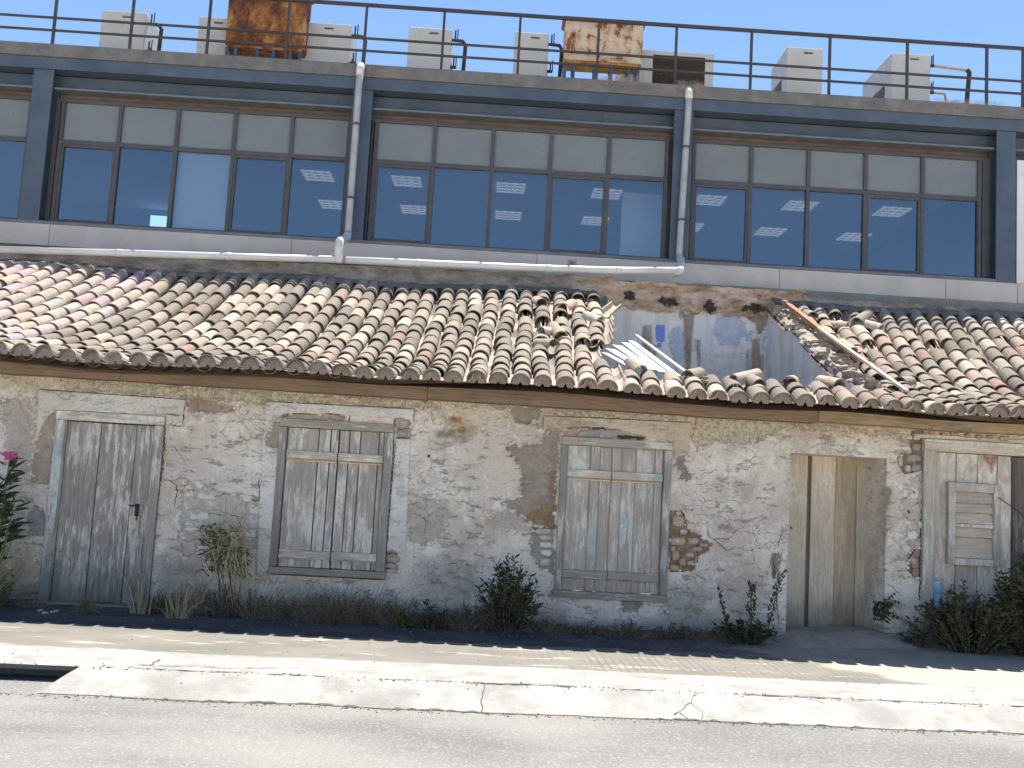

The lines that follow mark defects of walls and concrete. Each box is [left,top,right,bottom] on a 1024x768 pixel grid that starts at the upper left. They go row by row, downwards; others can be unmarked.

flaking render [60,379,434,448]
crack [41,389,260,552]
flaking render [499,405,942,607]
flaking render [385,550,403,573]
crack [107,659,320,676]
crack [110,679,572,715]
crack [622,689,969,729]
crack [906,727,1021,735]